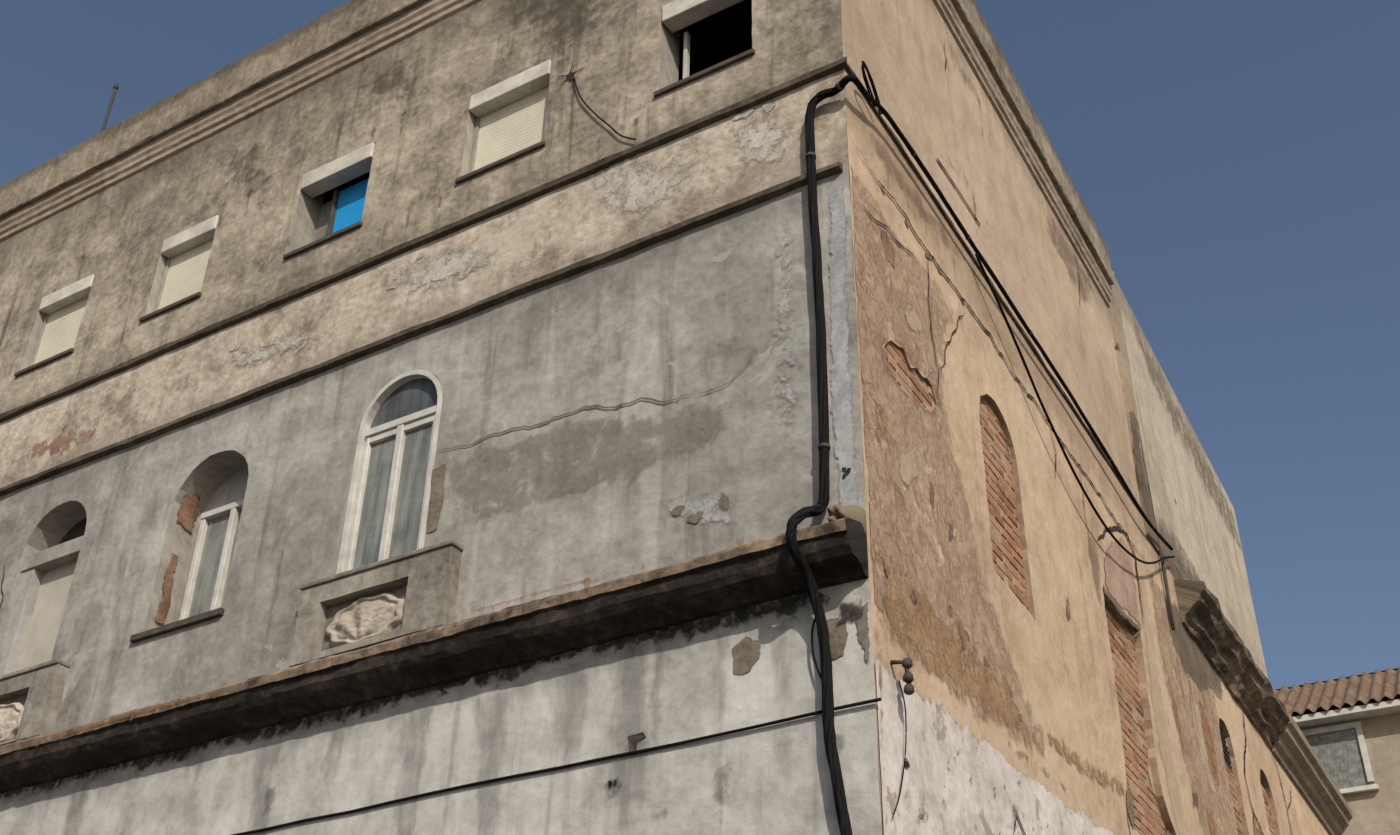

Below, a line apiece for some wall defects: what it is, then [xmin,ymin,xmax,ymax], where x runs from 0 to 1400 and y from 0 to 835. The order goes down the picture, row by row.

flaking render [155,554,178,624]
flaking render [177,492,201,532]
flaking render [427,357,752,533]
peeling [732,637,761,675]
peeling [826,167,1114,835]
crack [857,148,1161,626]
peeling [1150,573,1237,835]
crack [1242,708,1292,835]